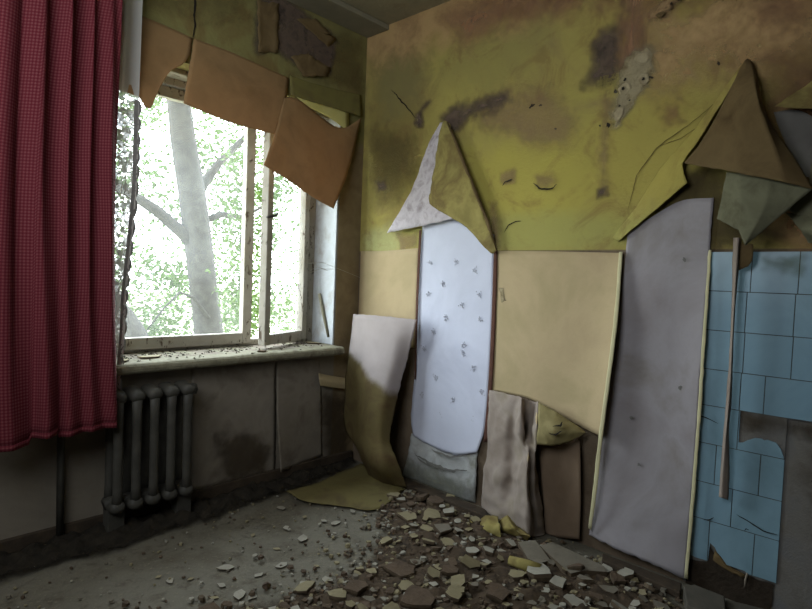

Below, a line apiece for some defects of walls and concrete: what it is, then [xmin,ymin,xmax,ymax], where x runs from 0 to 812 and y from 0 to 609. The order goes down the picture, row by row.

peeling [127,16,361,209]
leakage [441,94,566,138]
leakage [588,27,622,83]
spalling [599,25,655,128]
leakage [655,0,812,76]
peeling [683,411,812,609]